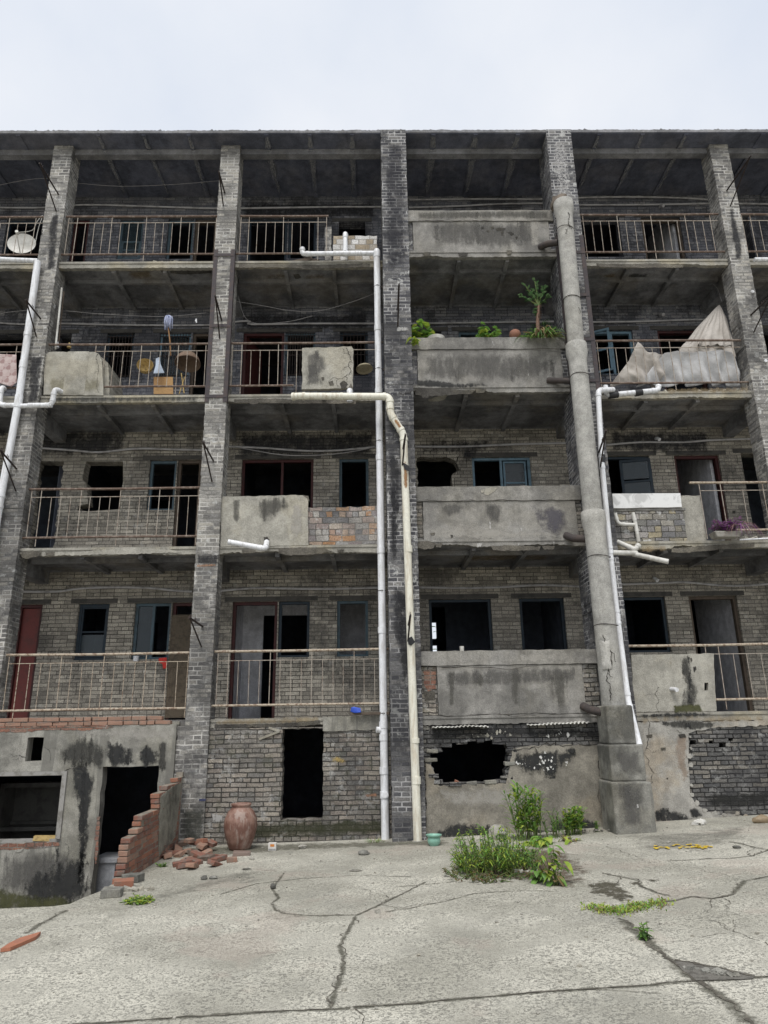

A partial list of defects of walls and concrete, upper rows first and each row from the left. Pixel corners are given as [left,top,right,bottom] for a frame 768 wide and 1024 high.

water stain [308,351,324,383]
water stain [259,498,301,532]
water stain [435,505,564,547]
water stain [448,655,574,704]
crack [602,635,616,700]
water stain [682,657,697,705]
spalling [424,729,568,786]
flaking render [668,728,748,817]
water stain [5,729,170,903]
crack [73,842,768,1024]